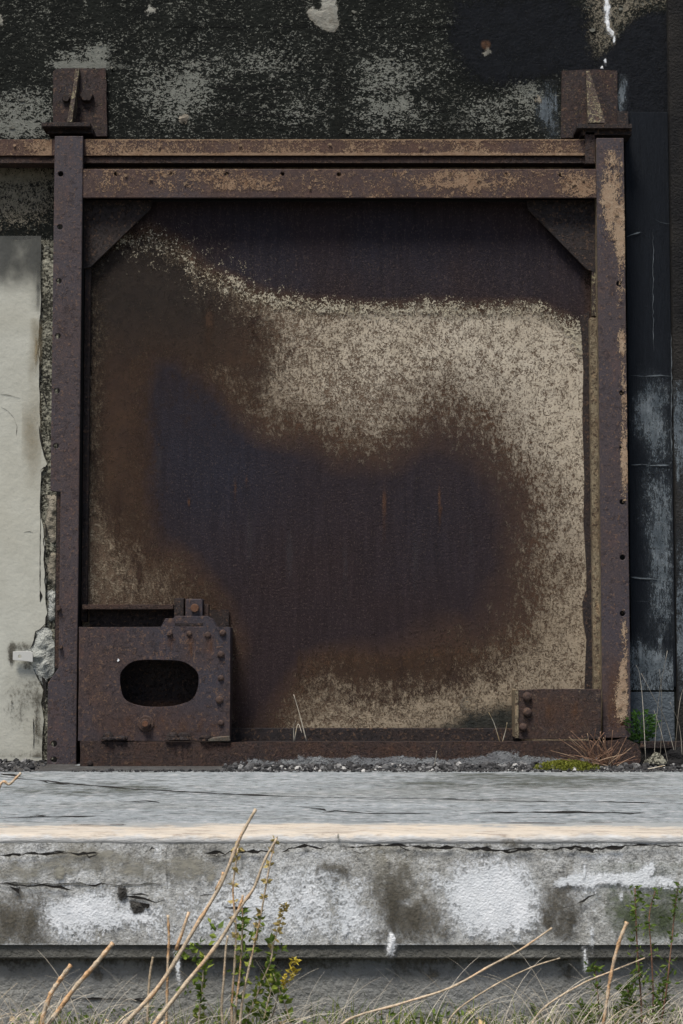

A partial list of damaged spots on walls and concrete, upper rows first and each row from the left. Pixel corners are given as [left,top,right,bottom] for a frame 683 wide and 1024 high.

peeling [0,0,585,155]
corrosion [89,202,592,728]
spalling [24,495,56,682]
crack [0,850,99,858]
crack [0,882,165,909]
water stain [0,850,683,984]
crack [204,798,683,857]